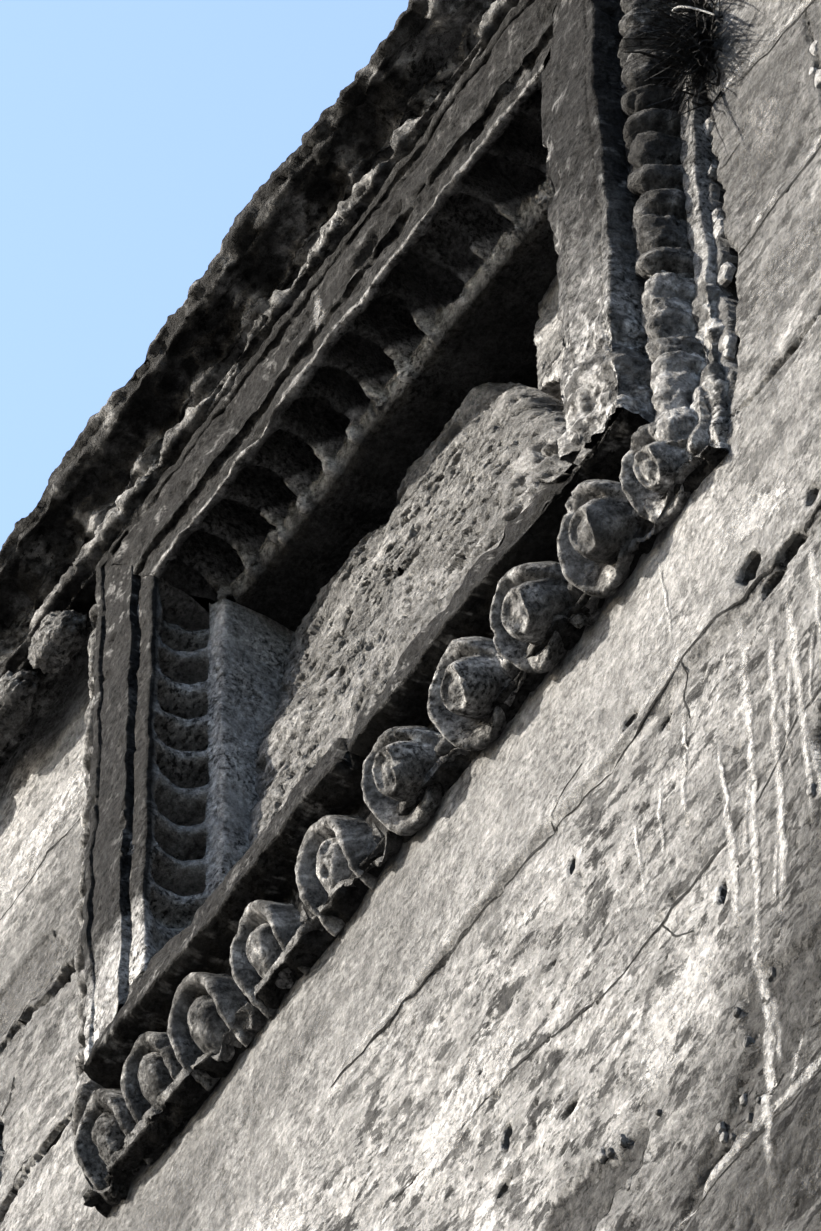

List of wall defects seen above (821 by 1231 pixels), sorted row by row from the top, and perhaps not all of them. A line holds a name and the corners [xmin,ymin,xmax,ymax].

crack [804,501,821,534]
crack [0,1077,70,1215]
crack [18,970,76,1025]
crack [331,562,821,1227]
damp [718,648,759,910]
damp [728,941,821,1226]
damp [768,610,821,894]